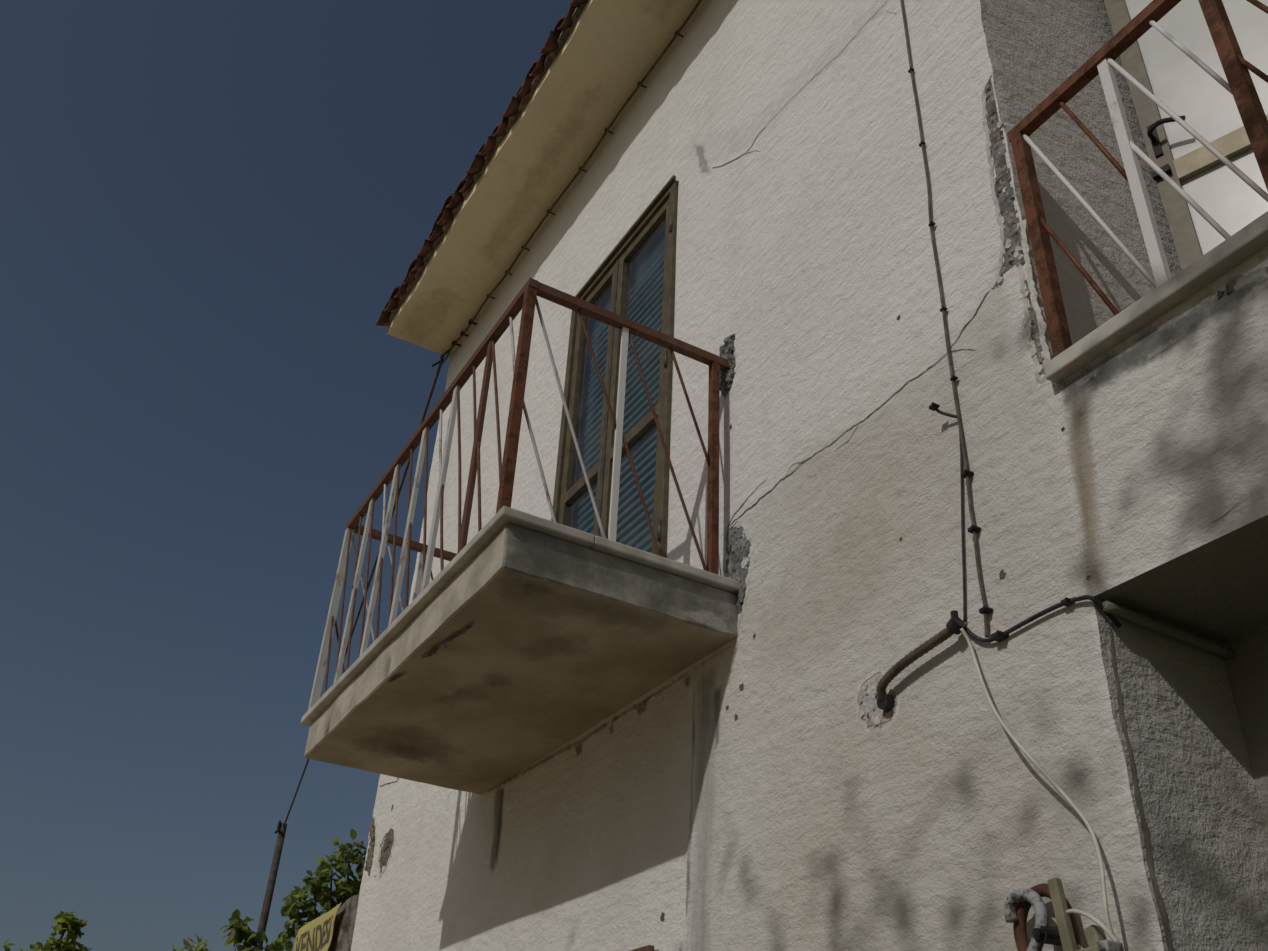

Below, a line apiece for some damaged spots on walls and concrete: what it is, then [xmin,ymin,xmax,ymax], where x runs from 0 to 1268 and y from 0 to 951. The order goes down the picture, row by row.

crack [711,3,894,169]
flaking render [981,75,1051,384]
water stain [1062,255,1268,398]
crack [727,291,989,528]
water stain [684,611,729,632]
flaking render [721,517,755,638]
spalling [855,667,902,738]
flaking render [364,817,396,877]